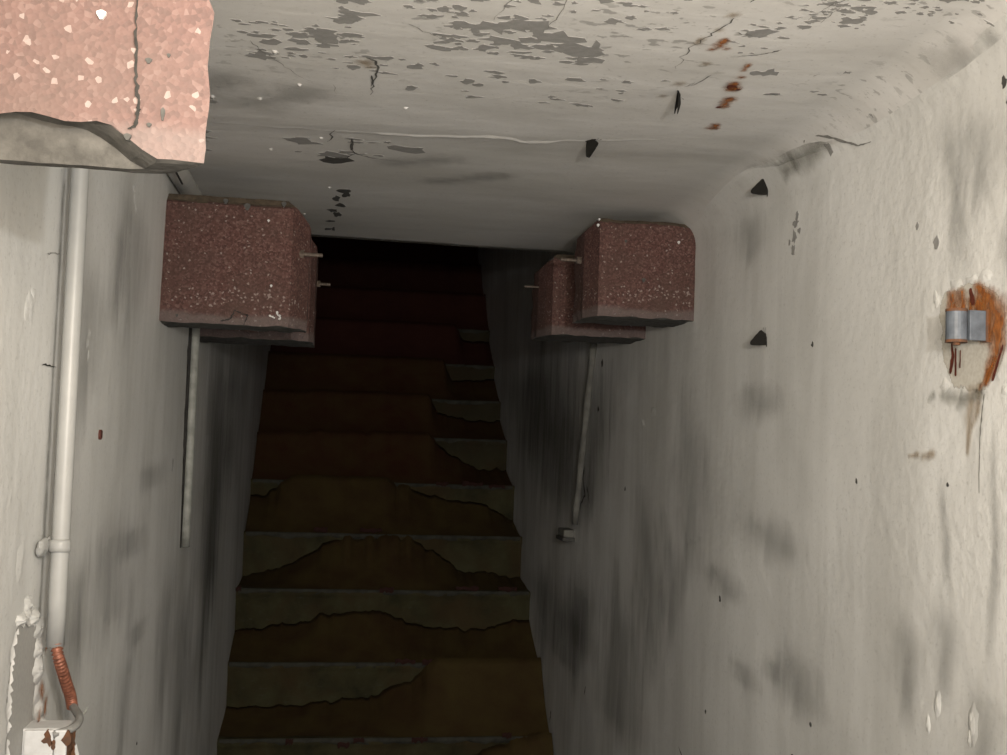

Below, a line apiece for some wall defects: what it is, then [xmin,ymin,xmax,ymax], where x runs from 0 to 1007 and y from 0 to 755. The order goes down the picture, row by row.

crack [128,0,141,130]
peeling [231,0,510,98]
peeling [403,0,605,65]
peeling [590,0,670,31]
corrosion [716,64,751,108]
peeling [750,68,779,76]
peeling [283,137,425,164]
corrosion [945,283,1006,412]
corrosion [38,684,72,750]